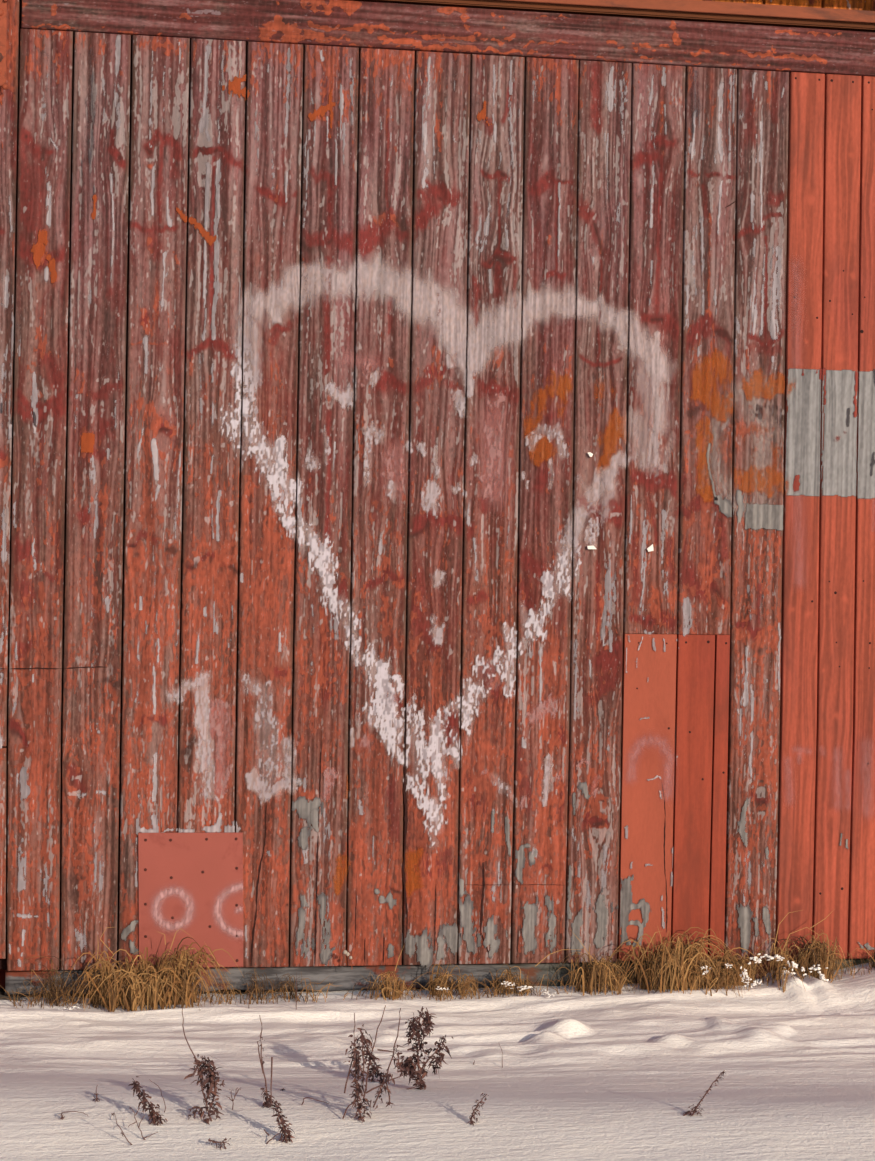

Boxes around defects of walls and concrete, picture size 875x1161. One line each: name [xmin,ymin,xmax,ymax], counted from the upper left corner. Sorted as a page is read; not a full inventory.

peeling [604,66,628,223]
peeling [689,74,744,164]
peeling [202,159,221,341]
peeling [735,121,782,353]
peeling [137,428,161,500]
peeling [601,558,616,652]
peeling [626,495,692,673]
peeling [737,647,754,782]
peeling [136,752,241,845]
peeling [387,809,538,969]
peeling [521,781,673,955]
peeling [737,798,771,954]